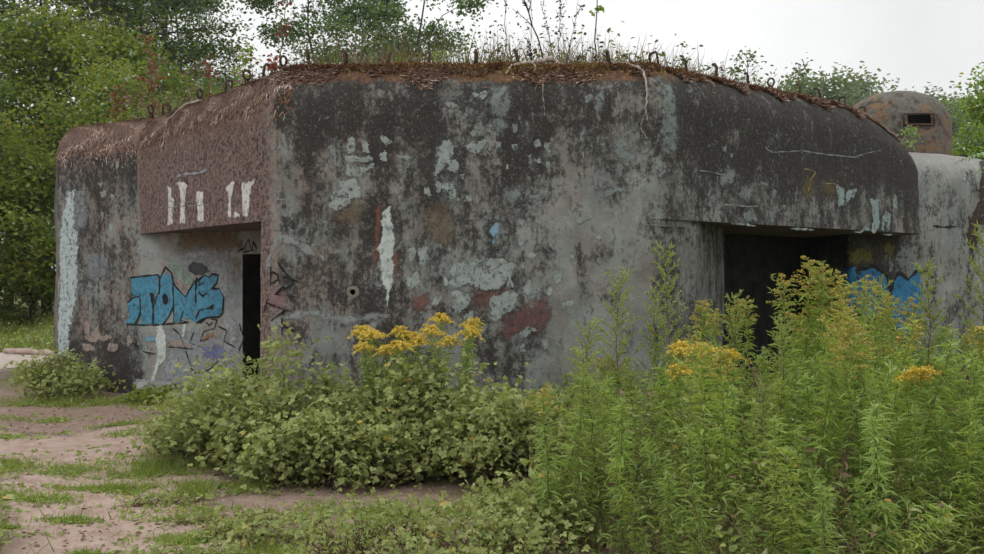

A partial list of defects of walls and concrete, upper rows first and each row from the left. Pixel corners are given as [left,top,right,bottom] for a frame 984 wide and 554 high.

peeling [328,135,411,211]
peeling [424,139,472,203]
peeling [466,85,519,154]
spalling [527,139,557,169]
damp [660,82,678,155]
crack [765,146,881,192]
damp [861,194,898,233]
damp [57,189,88,356]
peeling [432,242,563,323]